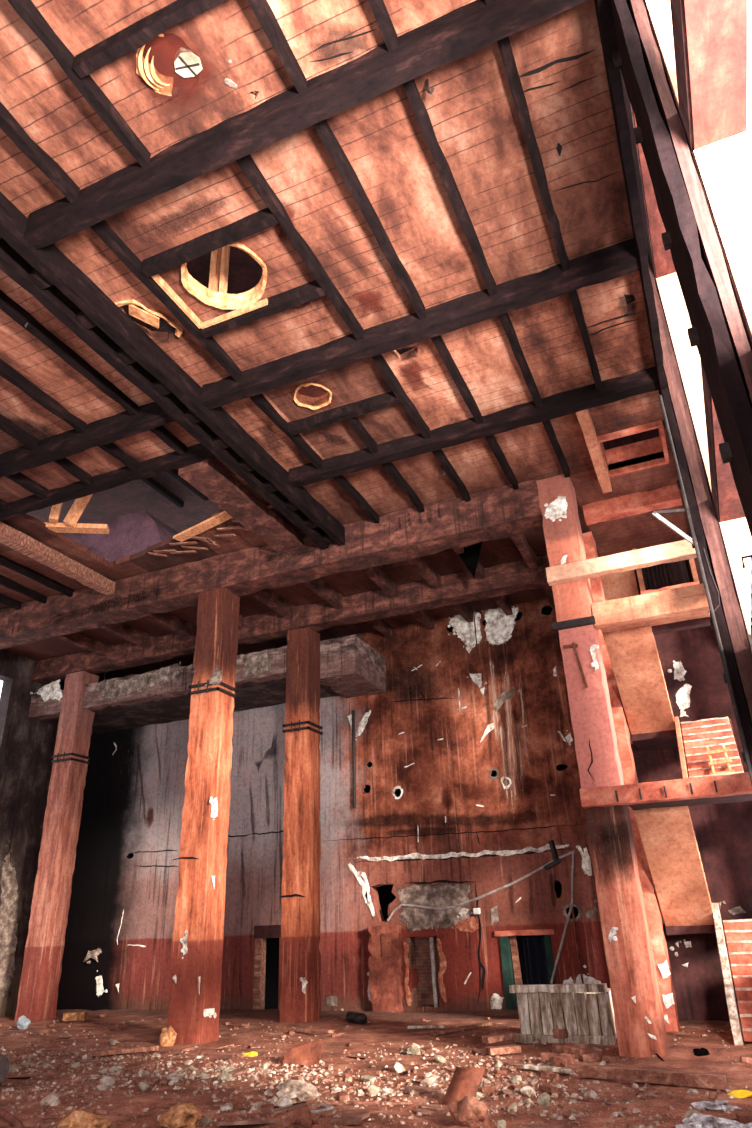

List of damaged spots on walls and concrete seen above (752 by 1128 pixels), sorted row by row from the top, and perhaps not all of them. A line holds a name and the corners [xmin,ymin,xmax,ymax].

crack [310,29,377,62]
crack [519,50,597,92]
peeling [544,495,568,522]
peeling [447,606,522,653]
spalling [30,680,63,702]
peeling [668,660,692,717]
flaking render [348,844,592,916]
flaking render [397,882,499,1006]